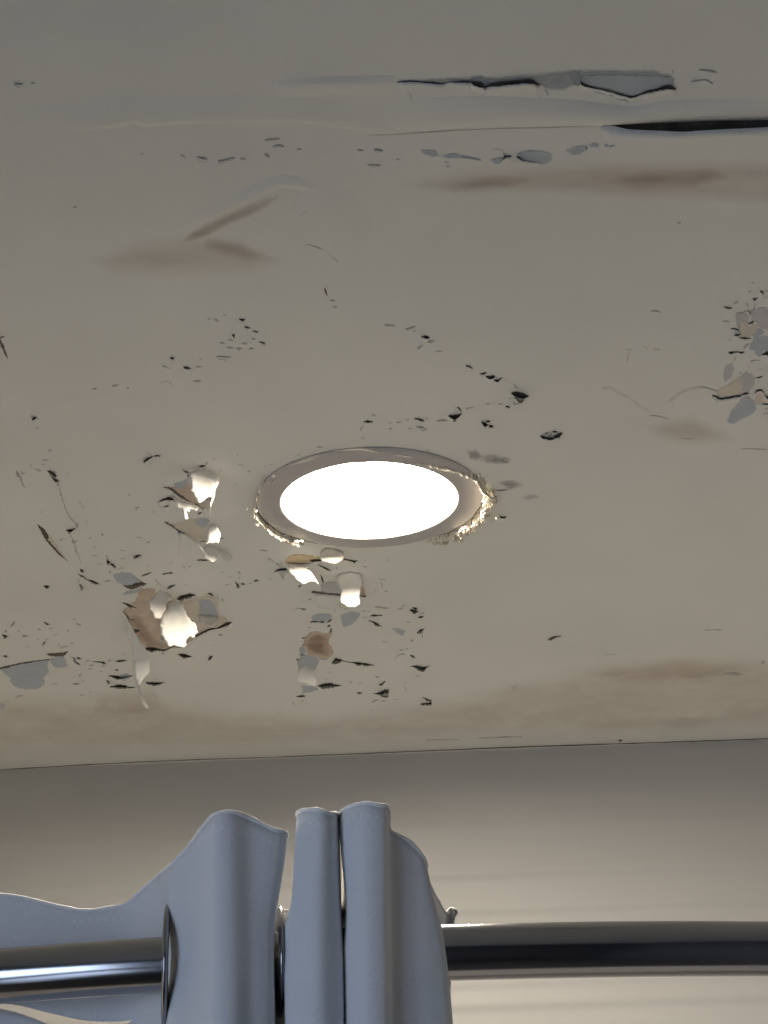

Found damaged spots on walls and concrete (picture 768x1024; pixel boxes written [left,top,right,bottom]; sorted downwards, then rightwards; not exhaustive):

peeling [397,70,676,102]
peeling [421,149,552,168]
peeling [697,282,768,424]
peeling [0,458,430,711]